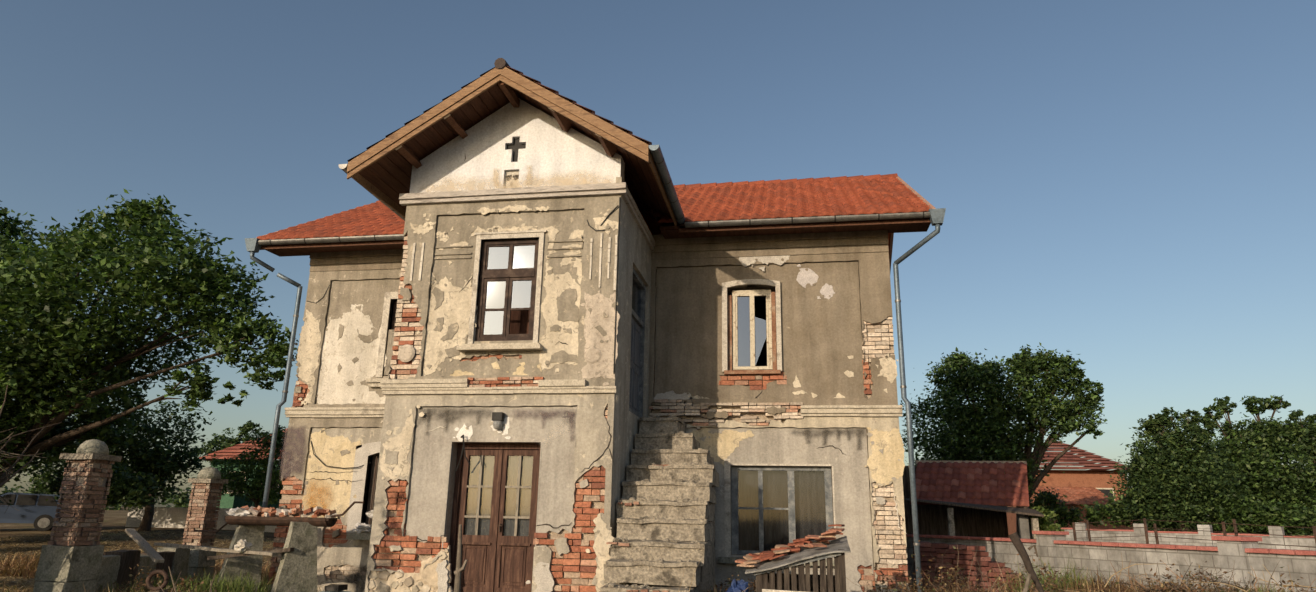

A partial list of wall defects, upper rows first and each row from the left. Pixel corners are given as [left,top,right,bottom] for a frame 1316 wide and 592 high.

peeling [292,199,620,407]
flaking render [649,370,817,466]
peeling [739,249,835,299]
flaking render [844,316,898,394]
peeling [267,428,362,585]
flaking render [325,405,453,592]
flaking render [526,465,640,592]
flaking render [857,427,908,591]